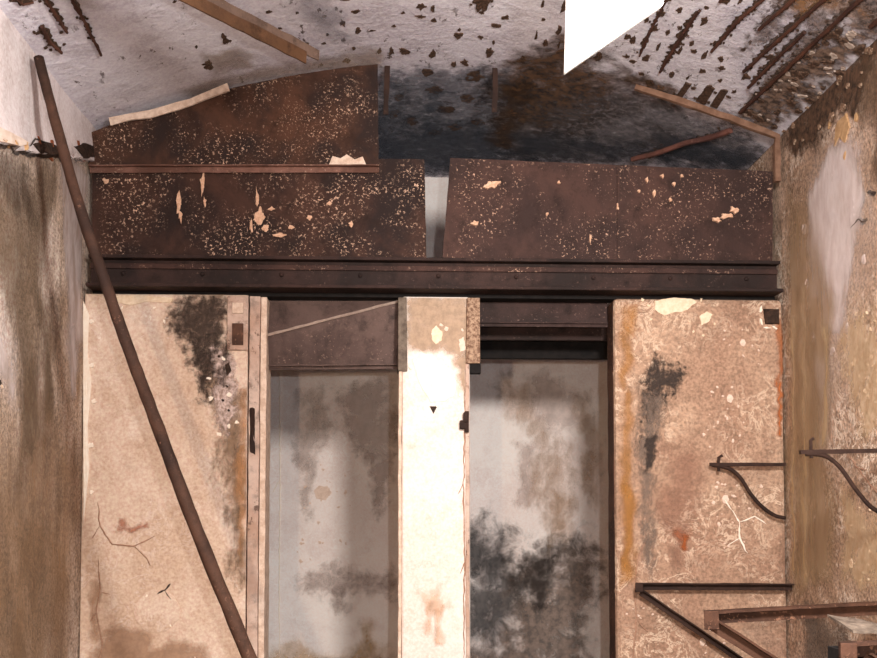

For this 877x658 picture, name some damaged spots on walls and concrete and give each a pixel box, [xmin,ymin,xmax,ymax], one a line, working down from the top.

spalling [9,0,68,55]
spalling [71,0,102,57]
spalling [377,47,410,56]
spalling [401,3,437,22]
spalling [470,0,493,15]
damp [167,295,230,404]
peeling [641,298,761,366]
damp [0,156,89,658]
damp [644,434,657,472]
damp [213,391,247,584]
corrosion [621,450,635,578]
damp [470,527,499,574]